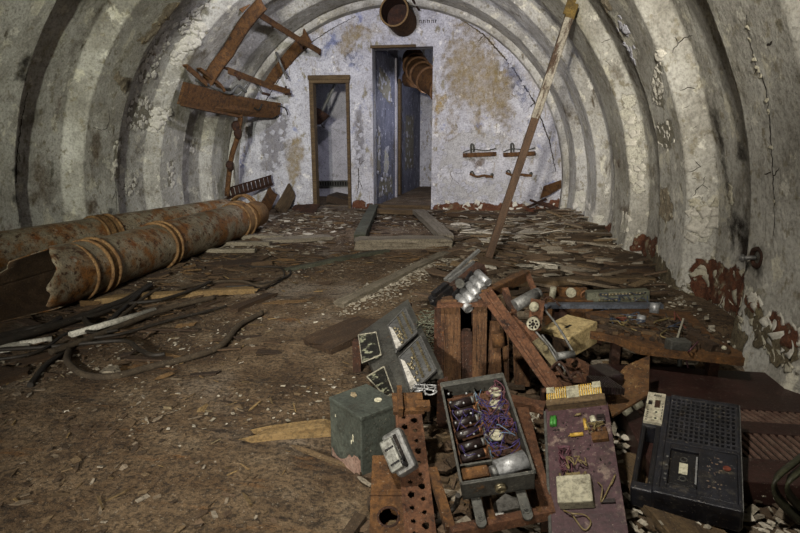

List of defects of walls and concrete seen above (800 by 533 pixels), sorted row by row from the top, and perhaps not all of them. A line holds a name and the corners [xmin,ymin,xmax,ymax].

peeling [111,2,210,199]
damp [447,23,510,108]
crack [461,20,556,172]
peeling [600,0,638,66]
peeling [650,49,668,107]
peeling [656,119,675,152]
crack [745,15,778,236]
spalling [572,184,800,375]